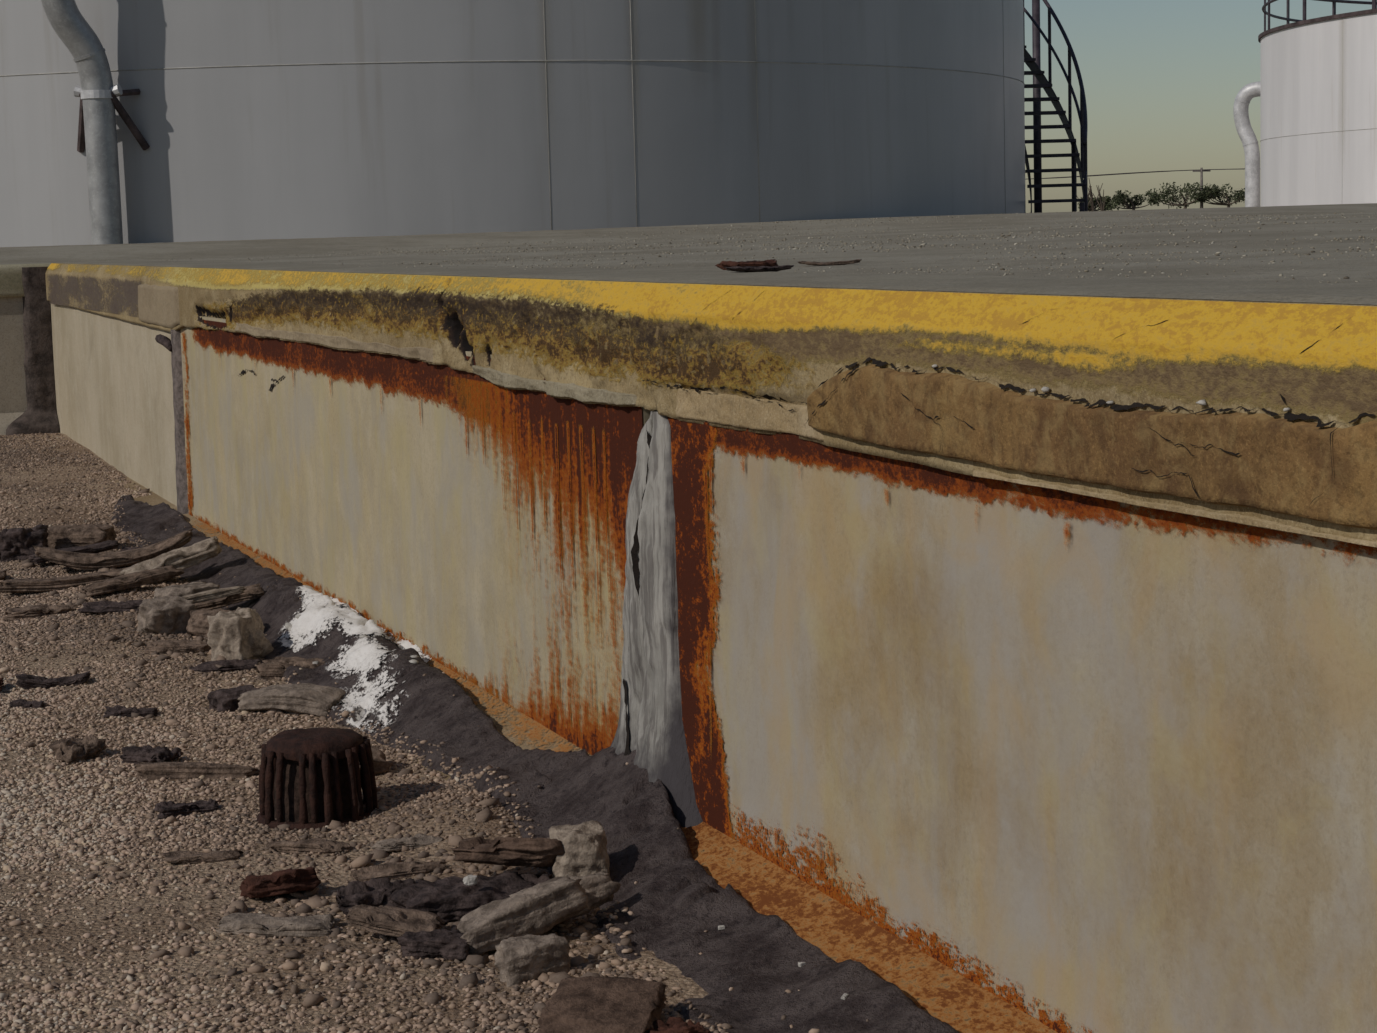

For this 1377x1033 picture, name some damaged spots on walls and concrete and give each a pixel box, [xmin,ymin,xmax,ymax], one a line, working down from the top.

water stain [226,286,734,364]
peeling [47,263,1377,405]
rust [182,320,642,755]
crack [631,431,652,596]
crack [642,357,1376,506]
peeling [676,364,1377,548]
water stain [278,585,430,733]
crack [623,679,631,756]
rust [667,416,1377,1033]